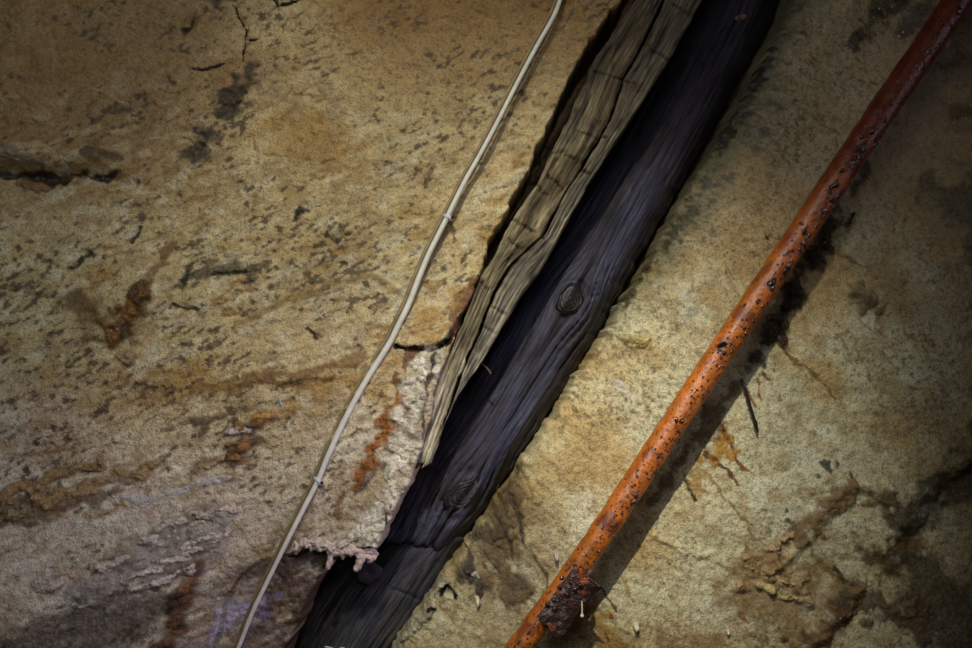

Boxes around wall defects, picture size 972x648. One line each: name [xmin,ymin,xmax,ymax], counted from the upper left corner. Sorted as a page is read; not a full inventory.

crack [191,0,261,72]
crack [273,0,299,8]
rust [234,274,400,324]
rust [180,350,367,478]
peeling [337,344,446,549]
rust [334,275,480,519]
damp [715,531,846,643]
damp [855,464,972,648]